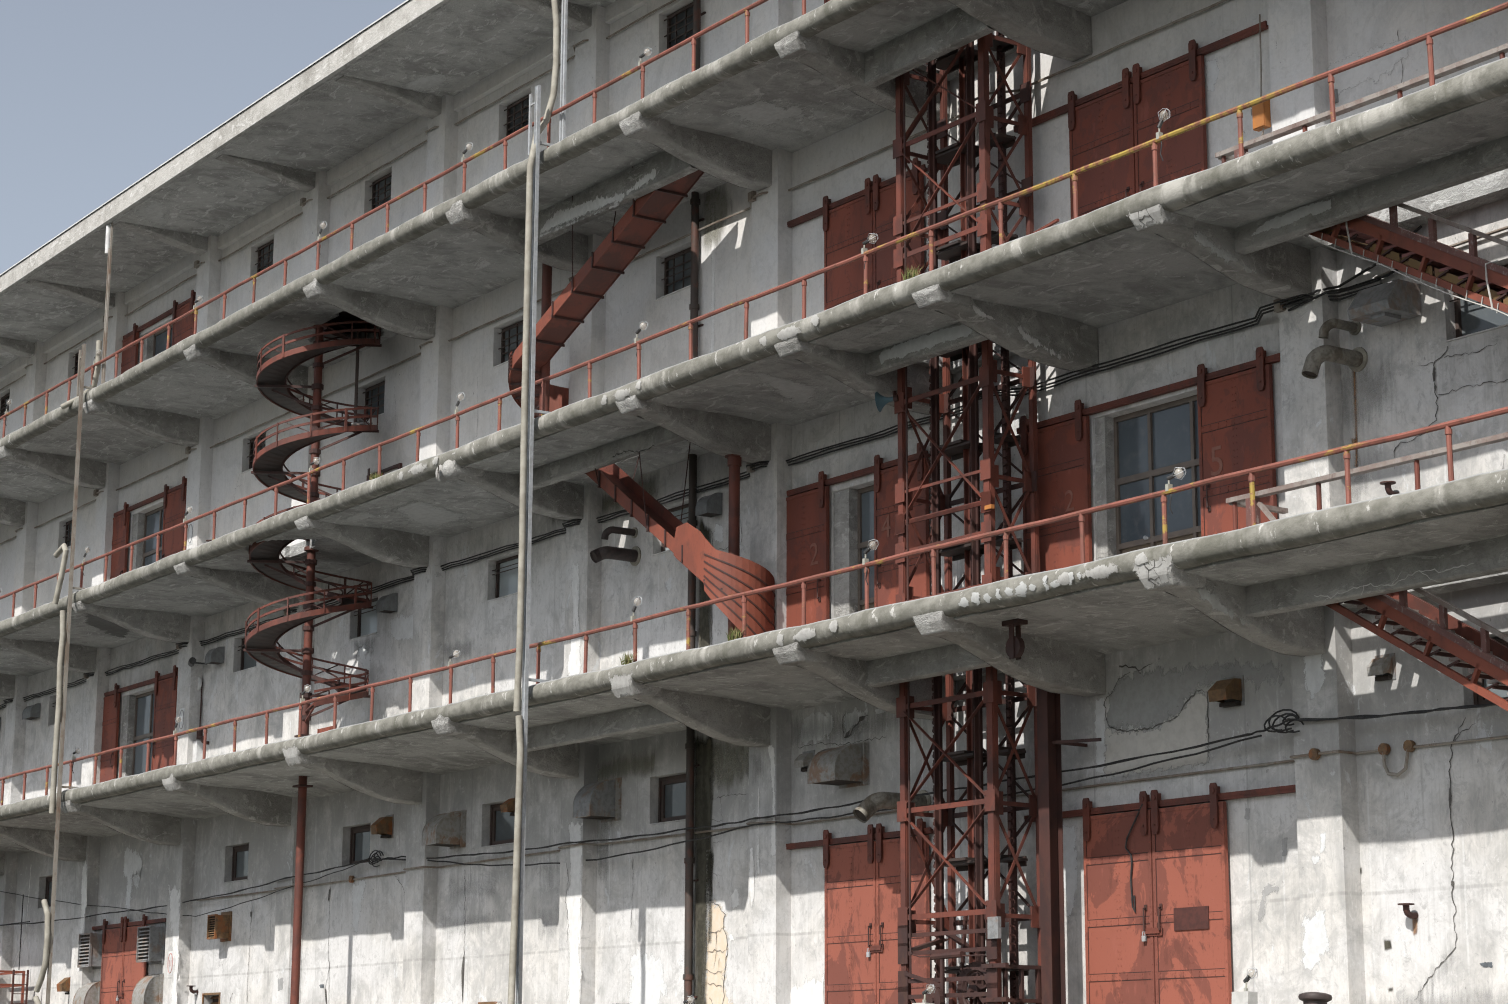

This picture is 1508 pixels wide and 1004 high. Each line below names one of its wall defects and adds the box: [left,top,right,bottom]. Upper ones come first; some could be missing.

crack [1393,344,1508,469]
crack [1416,717,1476,999]
flaking render [705,888,739,1004]